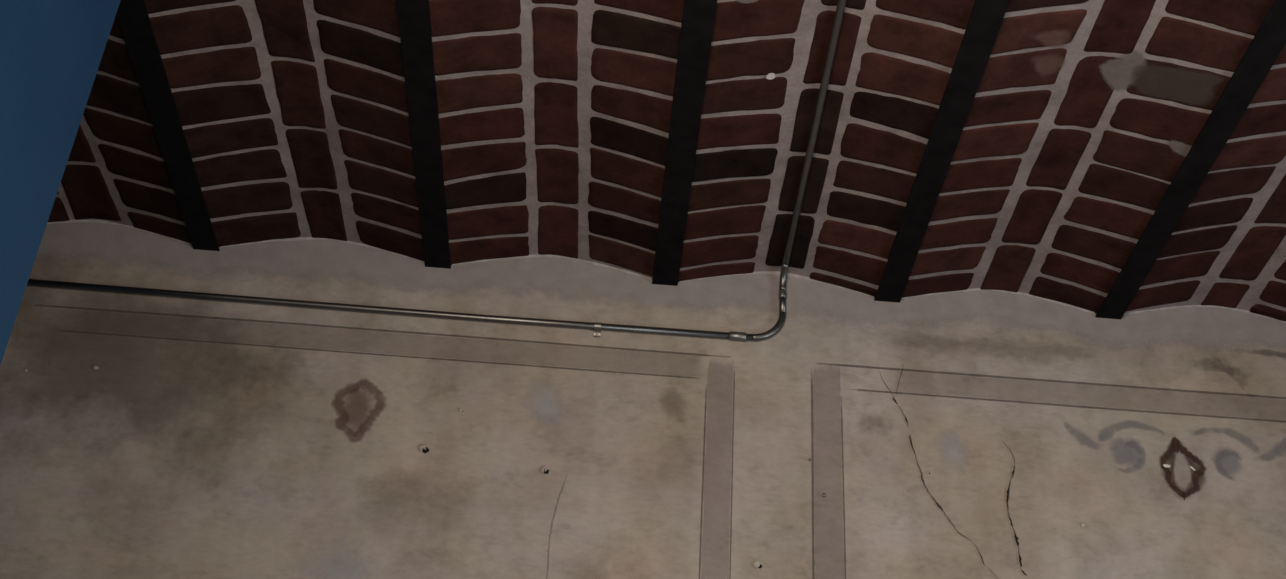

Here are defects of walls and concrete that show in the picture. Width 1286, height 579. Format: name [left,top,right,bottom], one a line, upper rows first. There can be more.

crack [880,364,1027,579]